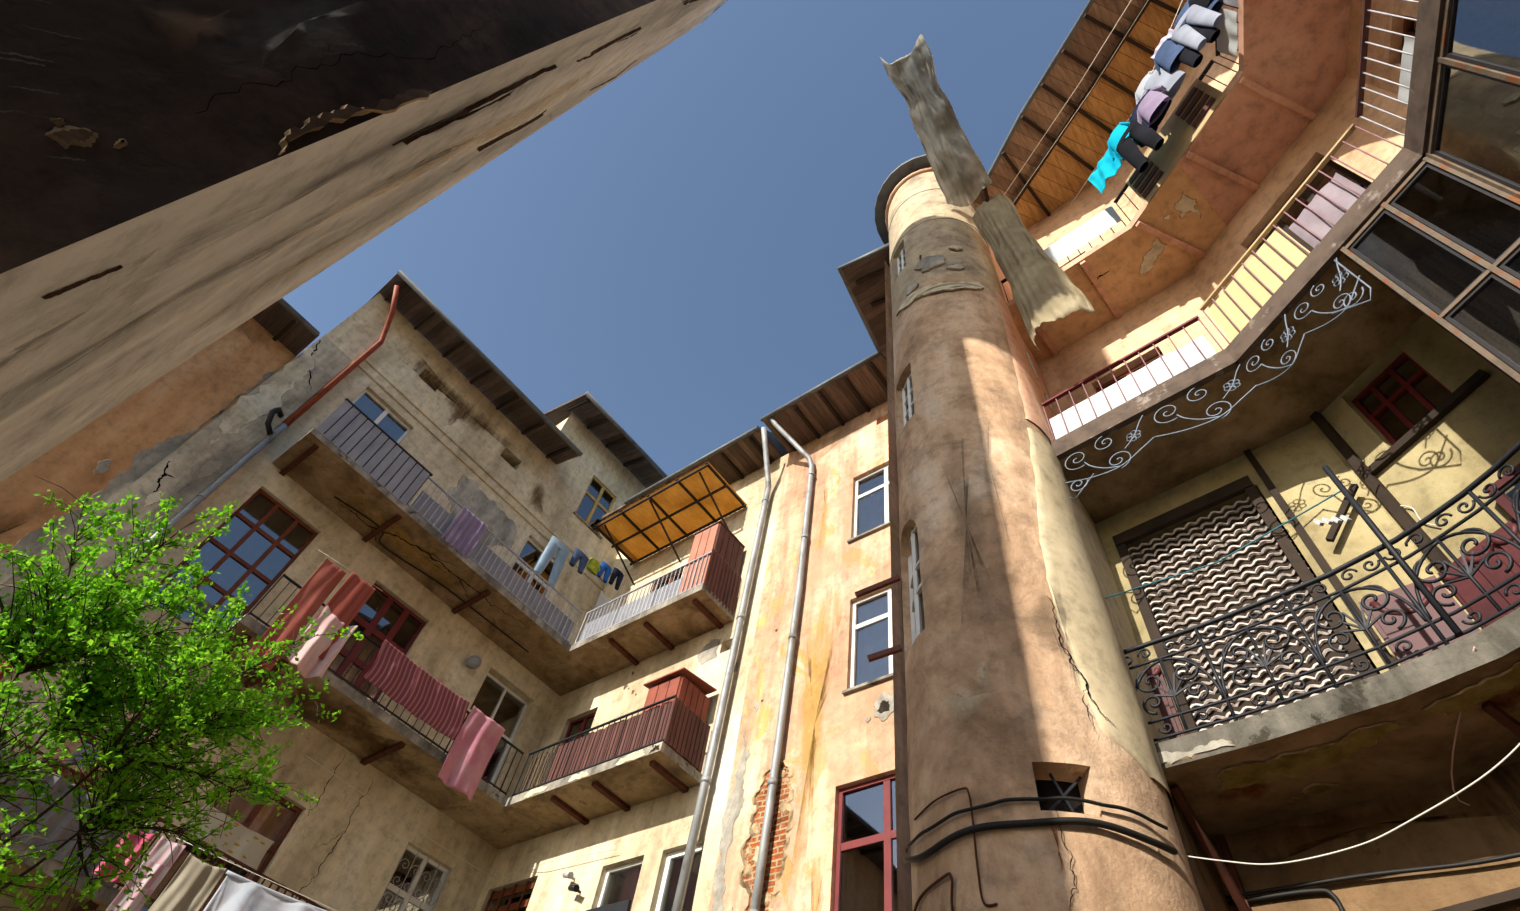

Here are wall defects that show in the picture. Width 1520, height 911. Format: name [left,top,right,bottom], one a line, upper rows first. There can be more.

crack [196,16,515,114]
flaking render [45,118,127,149]
flaking render [278,89,431,156]
flaking render [896,245,984,316]
crack [1047,596,1114,729]
flaking render [711,727,794,911]